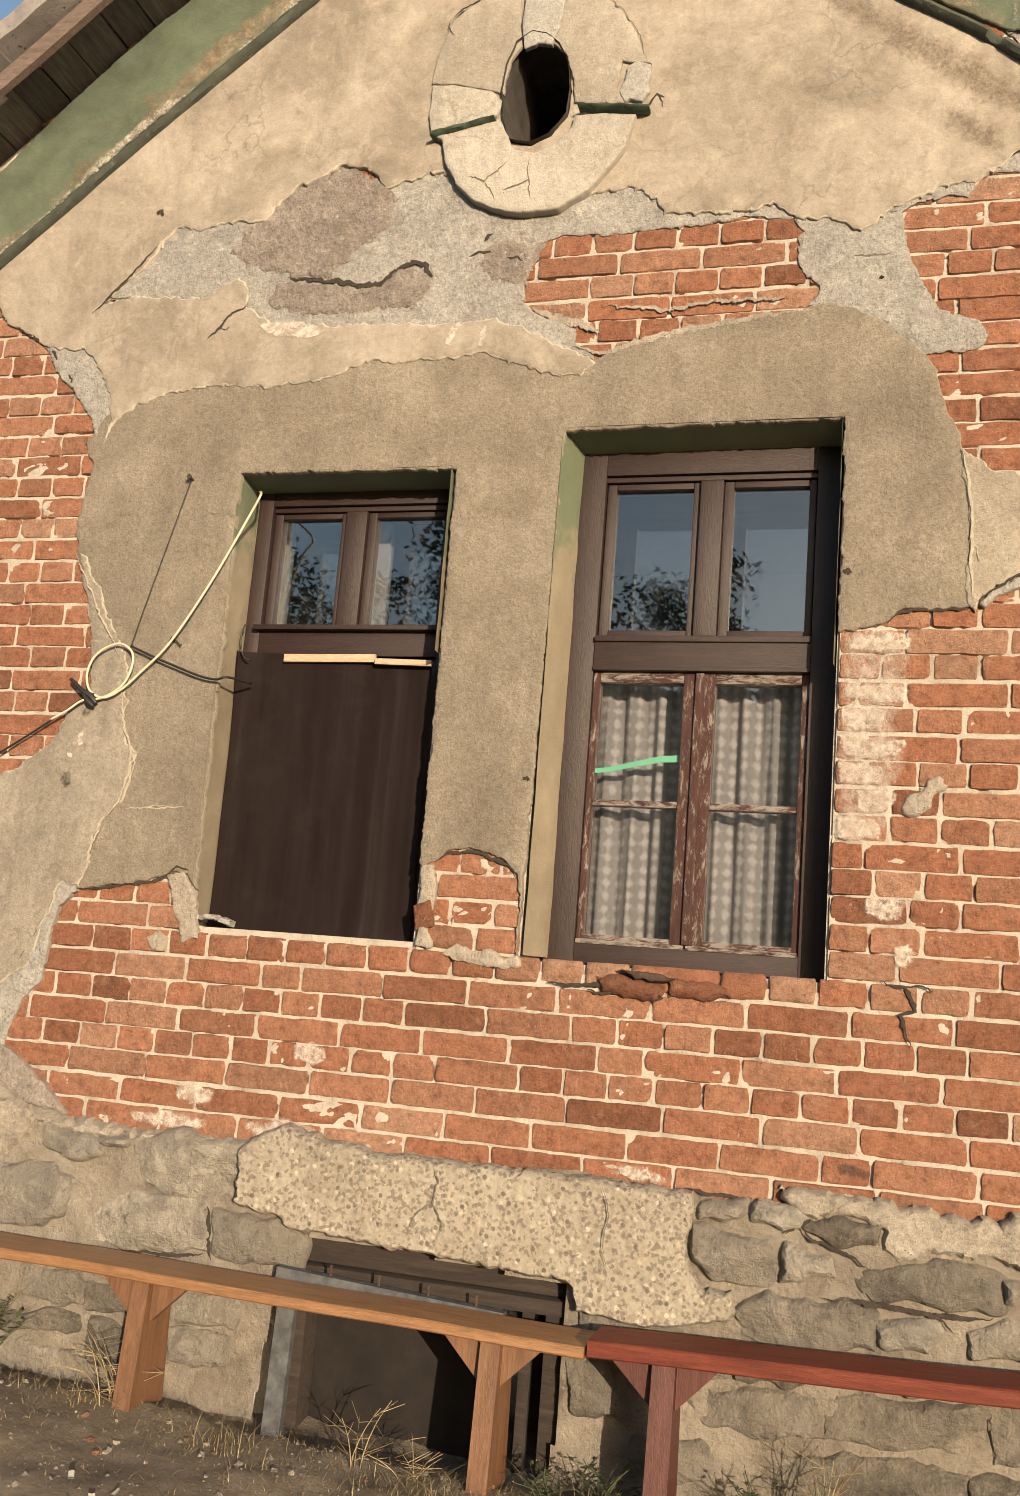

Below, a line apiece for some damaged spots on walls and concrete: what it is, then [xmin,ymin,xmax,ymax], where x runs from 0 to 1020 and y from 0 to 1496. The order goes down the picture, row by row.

flaking render [1006,28,1020,44]
peeling [0,95,185,254]
flaking render [110,150,1020,360]